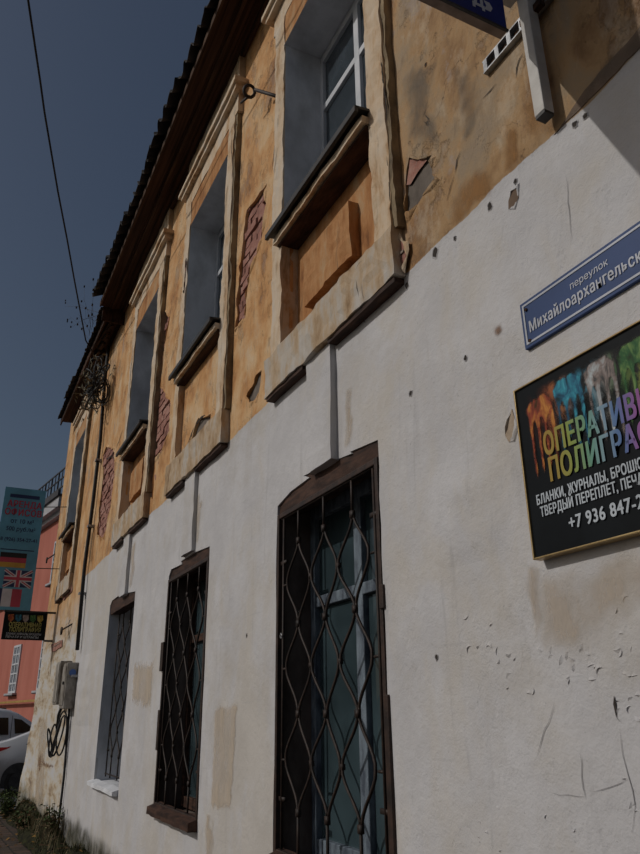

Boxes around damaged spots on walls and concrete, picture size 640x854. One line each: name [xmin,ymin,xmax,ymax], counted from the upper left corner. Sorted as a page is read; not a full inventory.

peeling [554,26,640,135]
spalling [403,150,440,221]
spalling [235,183,267,332]
spalling [151,310,172,499]
spalling [97,445,116,541]
crack [551,736,635,829]